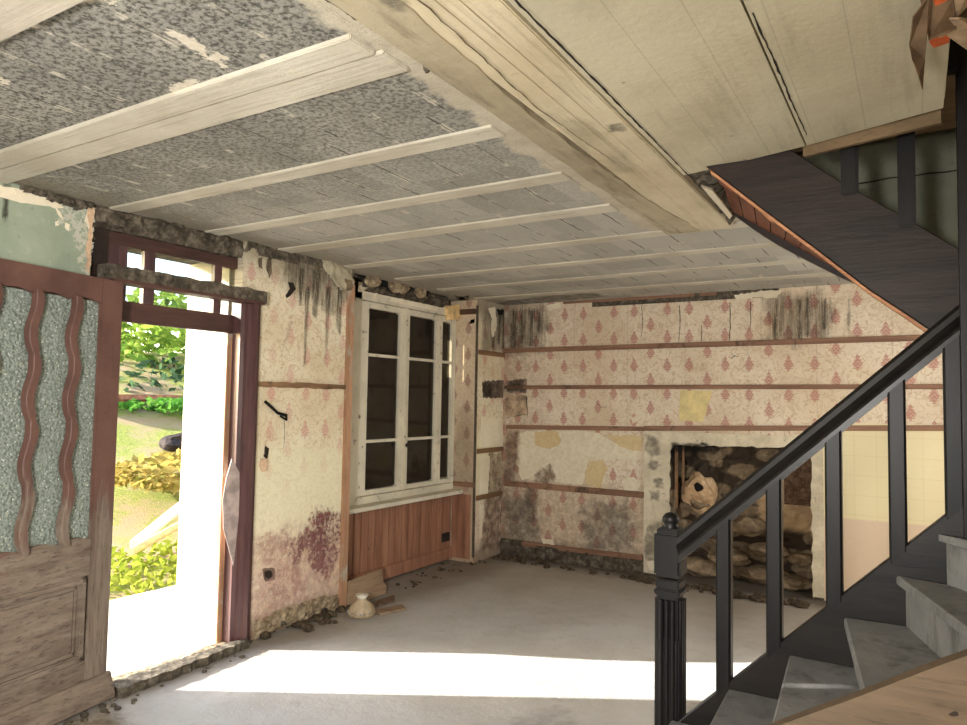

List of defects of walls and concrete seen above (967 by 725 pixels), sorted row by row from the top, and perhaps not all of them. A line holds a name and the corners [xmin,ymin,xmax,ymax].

peeling [0,185,95,275]
damp [482,431,663,574]